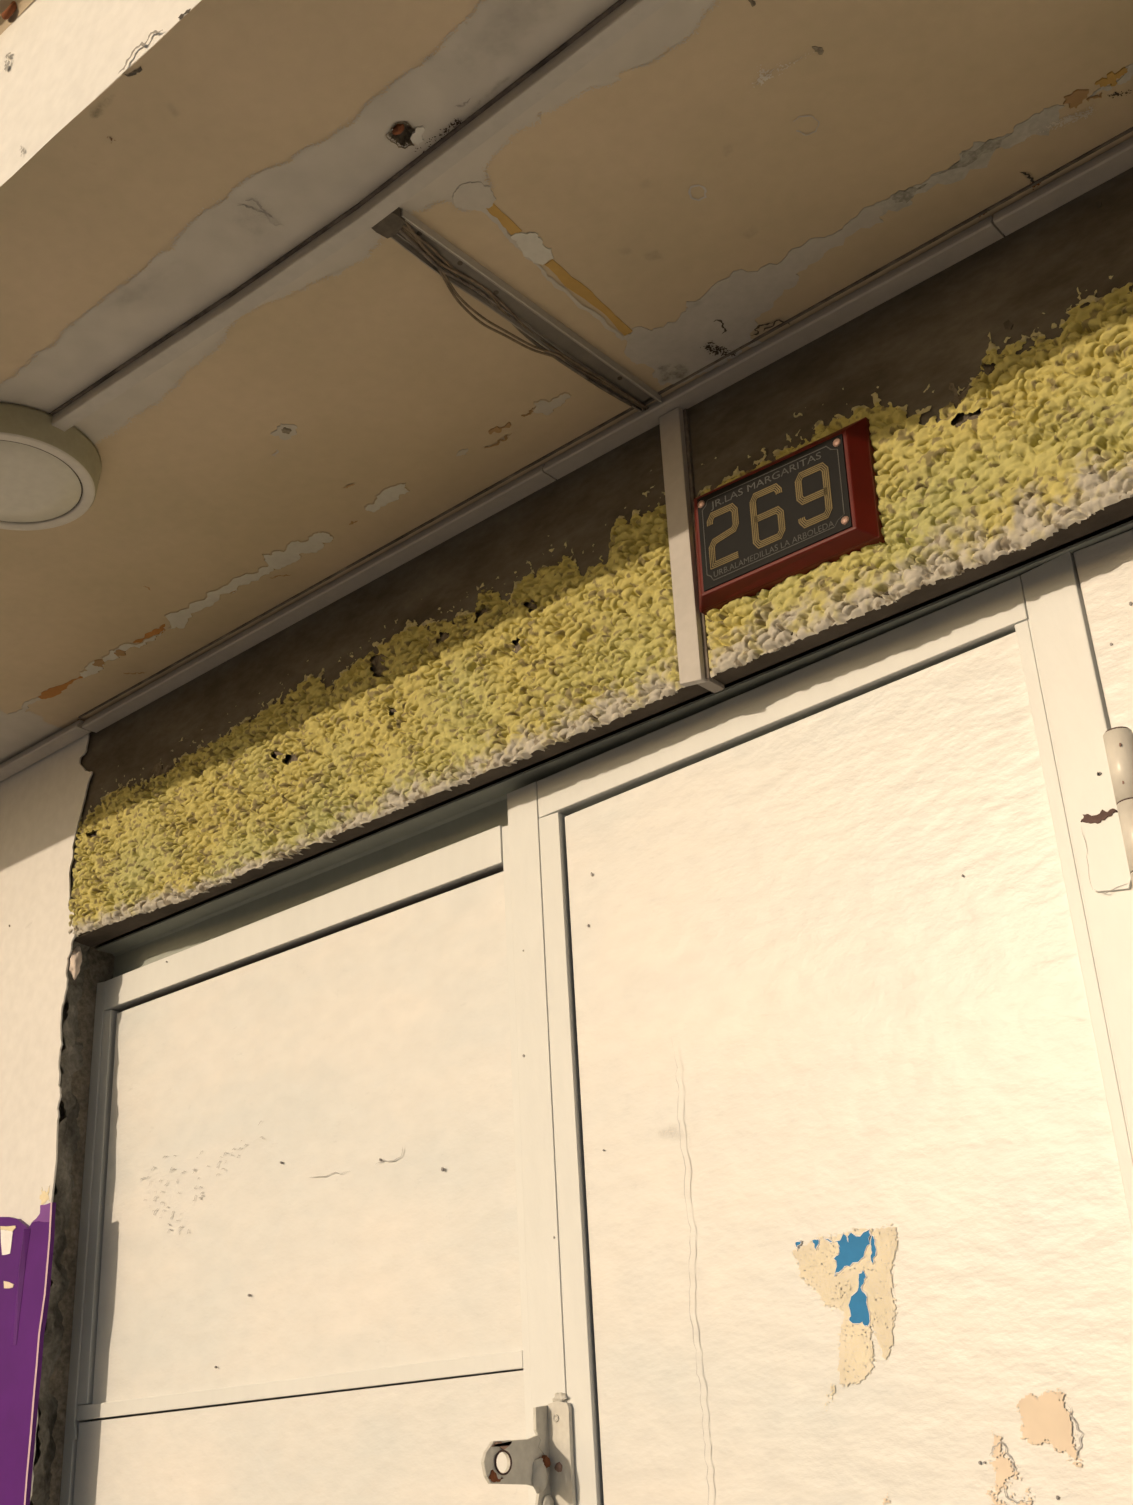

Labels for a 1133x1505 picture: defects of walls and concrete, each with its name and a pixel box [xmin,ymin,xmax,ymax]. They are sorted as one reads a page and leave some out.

crack [118,9,191,77]
flaking render [0,0,618,414]
peeling [452,63,1133,385]
peeling [0,531,334,764]
spalling [371,654,389,677]
peeling [978,1388,1083,1505]